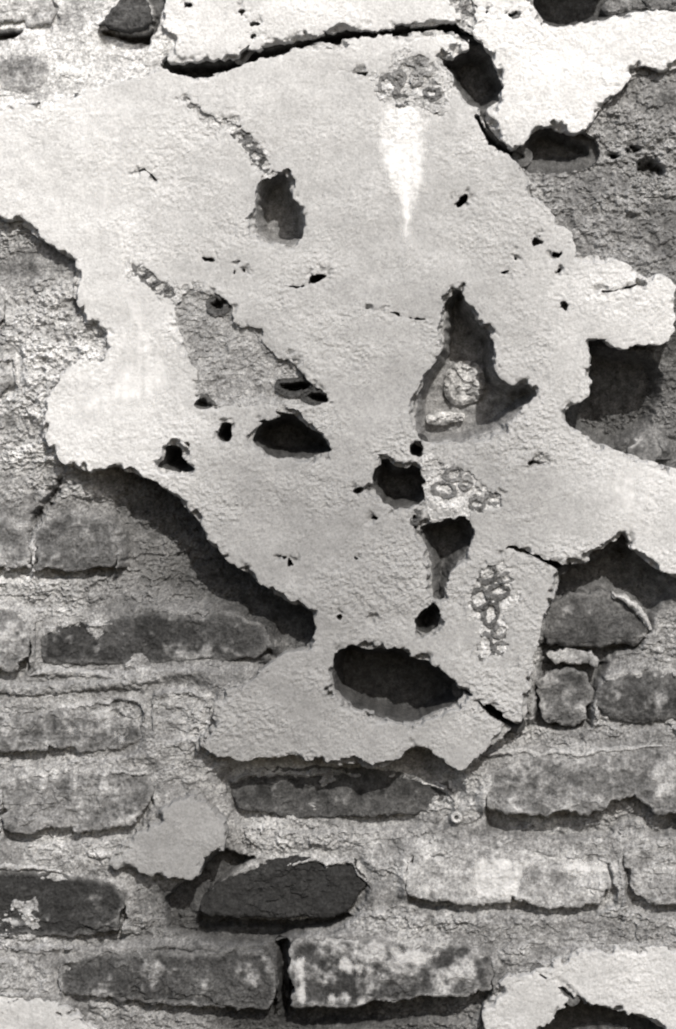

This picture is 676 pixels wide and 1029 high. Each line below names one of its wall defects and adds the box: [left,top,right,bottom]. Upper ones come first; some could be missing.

crack [162,23,481,79]
peeling [0,0,676,771]
peeling [109,789,229,880]
peeling [0,996,99,1029]
peeling [481,944,676,1029]